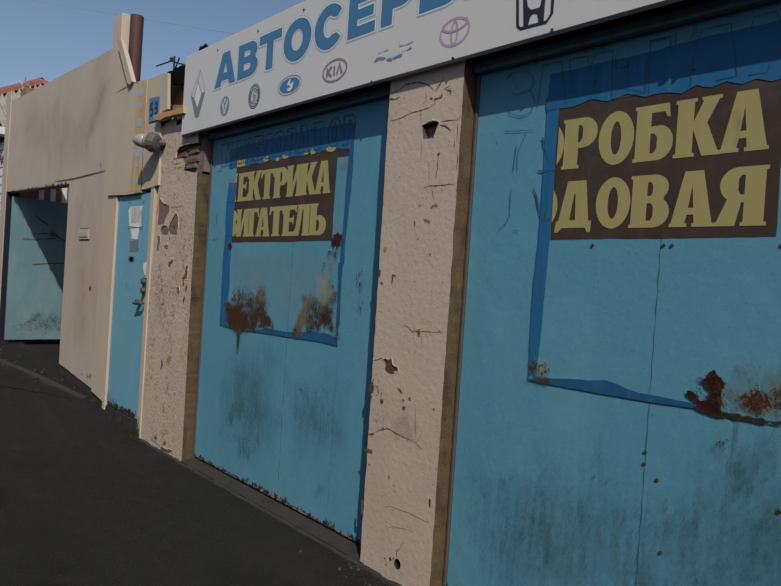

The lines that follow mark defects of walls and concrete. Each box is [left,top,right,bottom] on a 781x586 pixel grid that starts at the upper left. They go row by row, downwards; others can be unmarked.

spalling [175,140,204,173]
spalling [422,119,440,139]
peeling [157,196,179,267]
rust [222,285,273,350]
rust [292,232,343,340]
peeling [374,356,399,375]
rust [529,360,551,384]
rust [687,369,781,433]
rust [194,454,361,544]